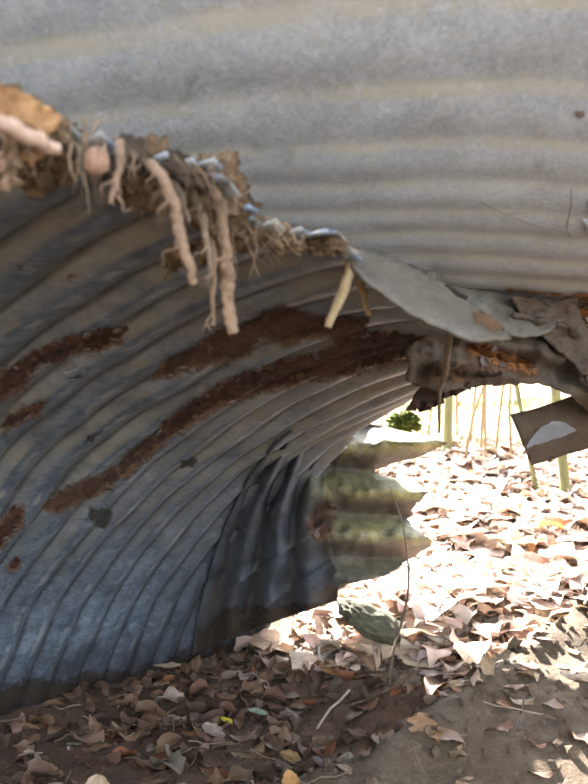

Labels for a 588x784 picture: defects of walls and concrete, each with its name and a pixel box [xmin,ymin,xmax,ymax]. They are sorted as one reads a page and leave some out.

rust [0,398,50,431]
rust [0,325,129,403]
rust [42,306,416,514]
rust [405,343,539,413]
rust [0,505,25,550]